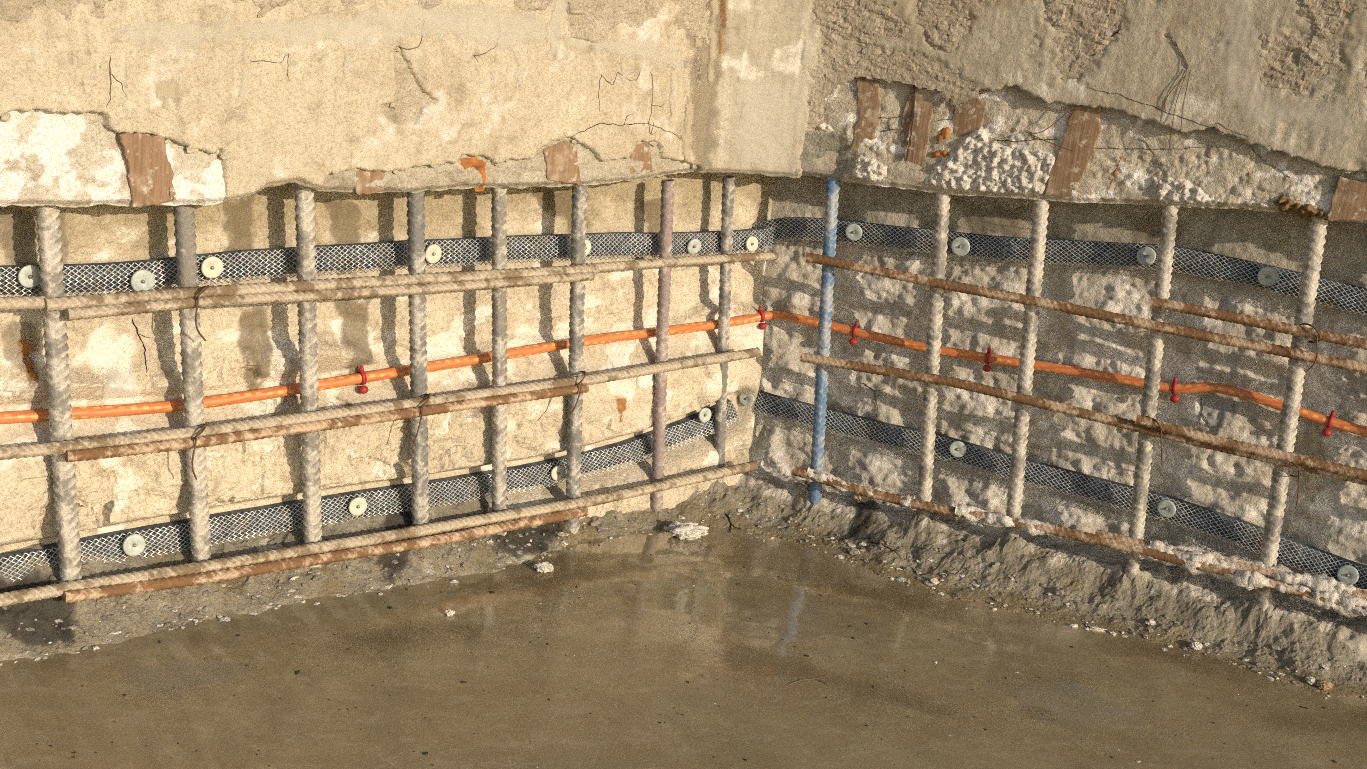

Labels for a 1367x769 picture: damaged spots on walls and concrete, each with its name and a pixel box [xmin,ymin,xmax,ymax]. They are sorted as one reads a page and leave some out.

spalling [796,0,1367,224]
crack [1087,29,1288,176]
spalling [0,109,132,208]
spalling [147,134,230,206]
corrosion [459,156,486,191]
spalling [311,137,697,193]
corrosion [18,340,39,381]
corrosion [617,398,627,422]